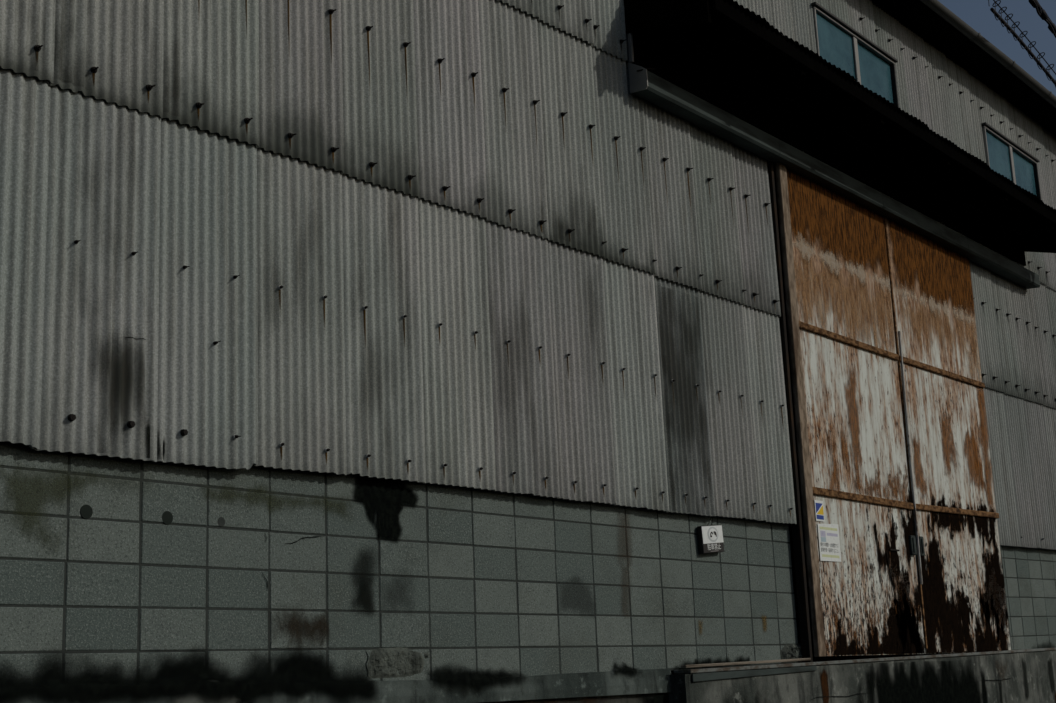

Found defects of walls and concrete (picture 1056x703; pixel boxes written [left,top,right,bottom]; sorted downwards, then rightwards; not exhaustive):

corrosion [786,168,975,318]
water stain [107,356,131,412]
water stain [660,295,705,440]
water stain [354,474,418,542]
water stain [0,615,375,703]
spalling [367,647,429,679]
corrosion [821,670,829,703]
water stain [860,660,988,703]
water stain [1038,644,1055,692]